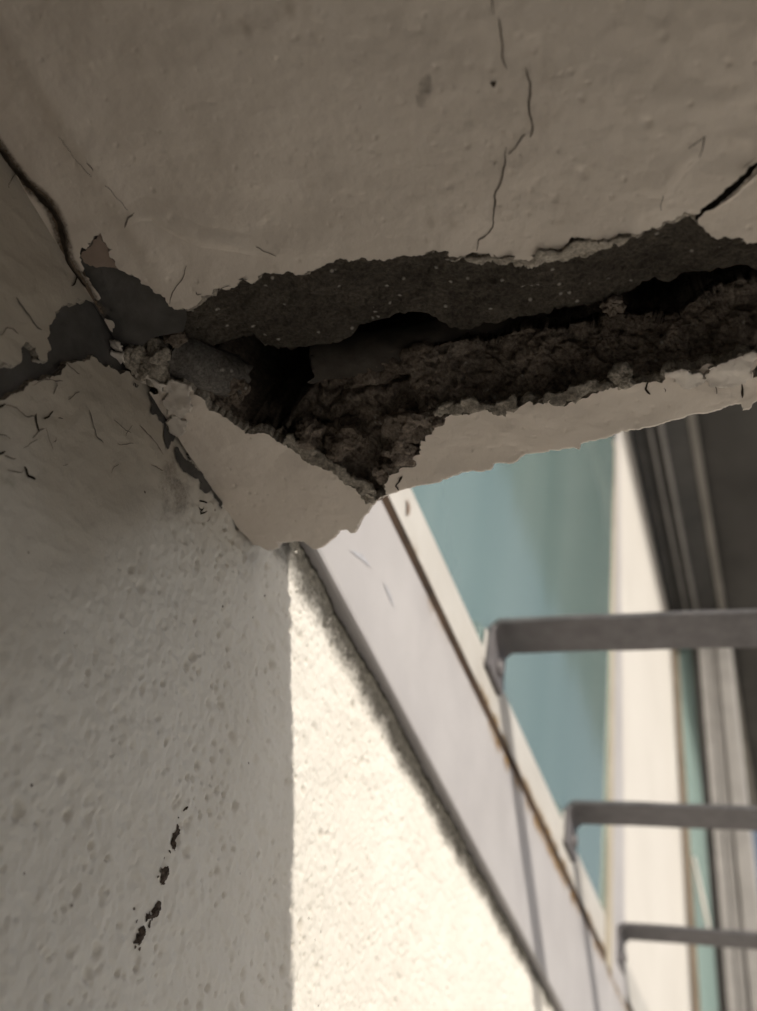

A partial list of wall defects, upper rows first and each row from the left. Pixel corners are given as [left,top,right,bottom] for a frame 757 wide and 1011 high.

crack [0,148,86,287]
crack [59,137,134,228]
crack [476,0,534,251]
crack [698,160,757,218]
crack [1,298,42,335]
spalling [0,212,757,509]
crack [0,364,163,480]